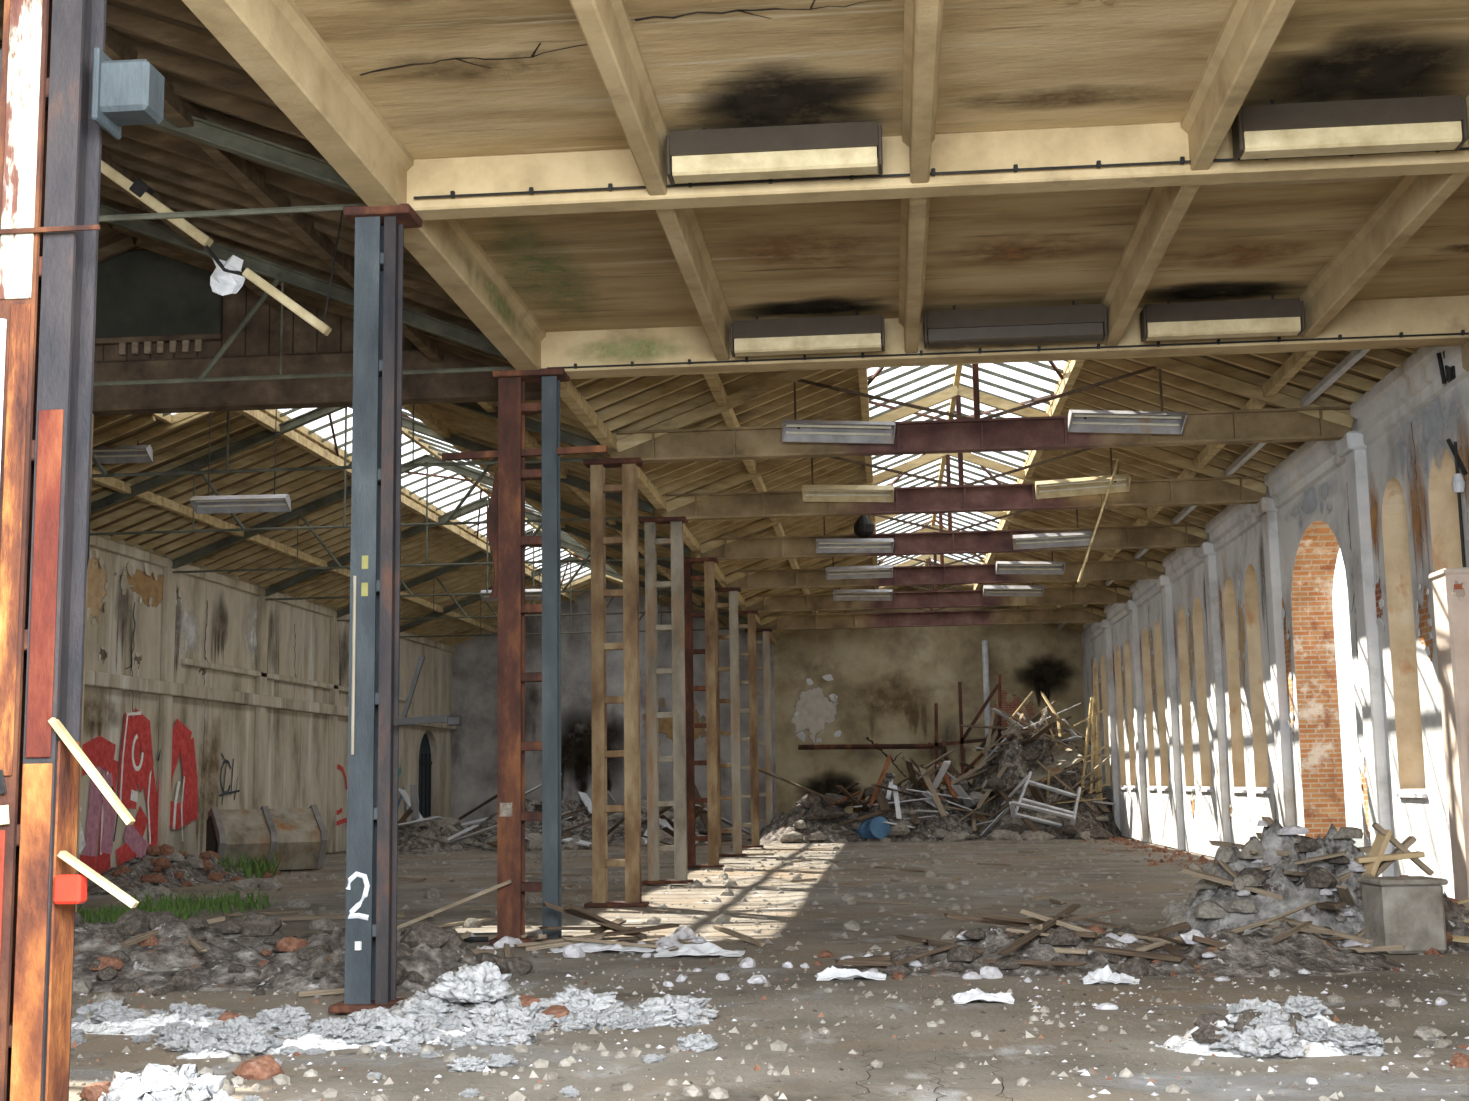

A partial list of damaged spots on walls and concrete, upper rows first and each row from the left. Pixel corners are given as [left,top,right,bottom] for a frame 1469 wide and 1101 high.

peeling [87,550,182,624]
peeling [791,674,842,743]
damp [1036,676,1050,706]